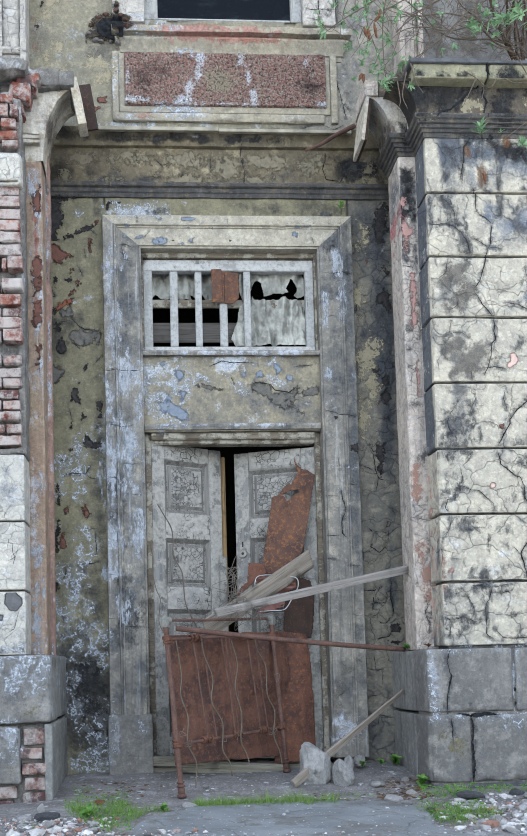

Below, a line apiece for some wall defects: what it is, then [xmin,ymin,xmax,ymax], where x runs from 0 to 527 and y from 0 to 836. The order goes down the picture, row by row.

spalling [85,1,134,46]
flaking render [0,94,20,153]
crack [436,62,490,117]
damp [477,88,527,174]
damp [400,167,418,263]
damp [427,193,479,312]
crack [432,135,527,376]
flaking render [0,184,121,449]
peeling [55,484,69,553]
damp [0,244,210,773]
crack [356,583,394,696]
crack [425,392,527,783]